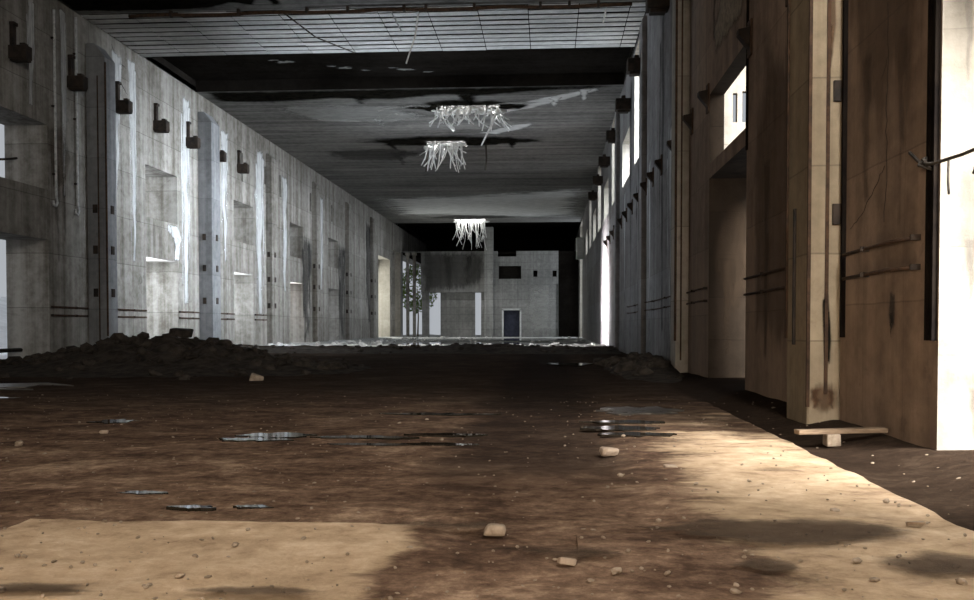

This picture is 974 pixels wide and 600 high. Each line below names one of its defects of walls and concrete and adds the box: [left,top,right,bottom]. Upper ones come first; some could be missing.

leakage [26,0,34,104]
leakage [60,0,255,195]
spalling [366,101,539,173]
spalling [435,216,508,250]
rust [810,388,833,409]